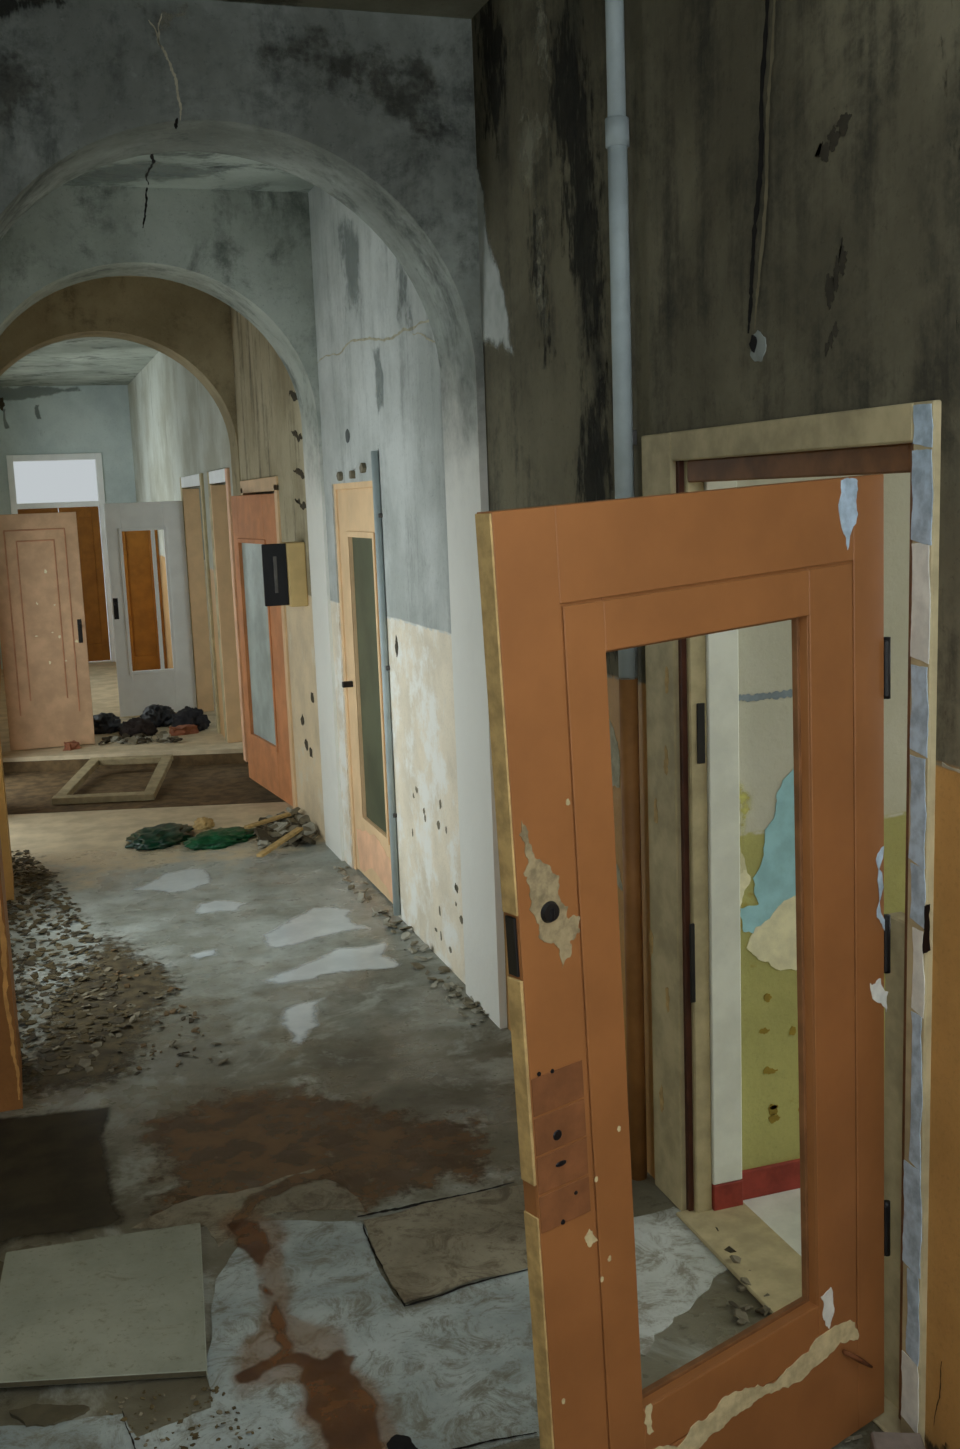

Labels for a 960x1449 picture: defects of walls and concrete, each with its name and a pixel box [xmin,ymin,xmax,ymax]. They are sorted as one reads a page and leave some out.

crack [148,14,182,129]
water stain [475,0,507,158]
crack [143,154,156,227]
efflorescence [476,170,512,351]
water stain [528,1,613,502]